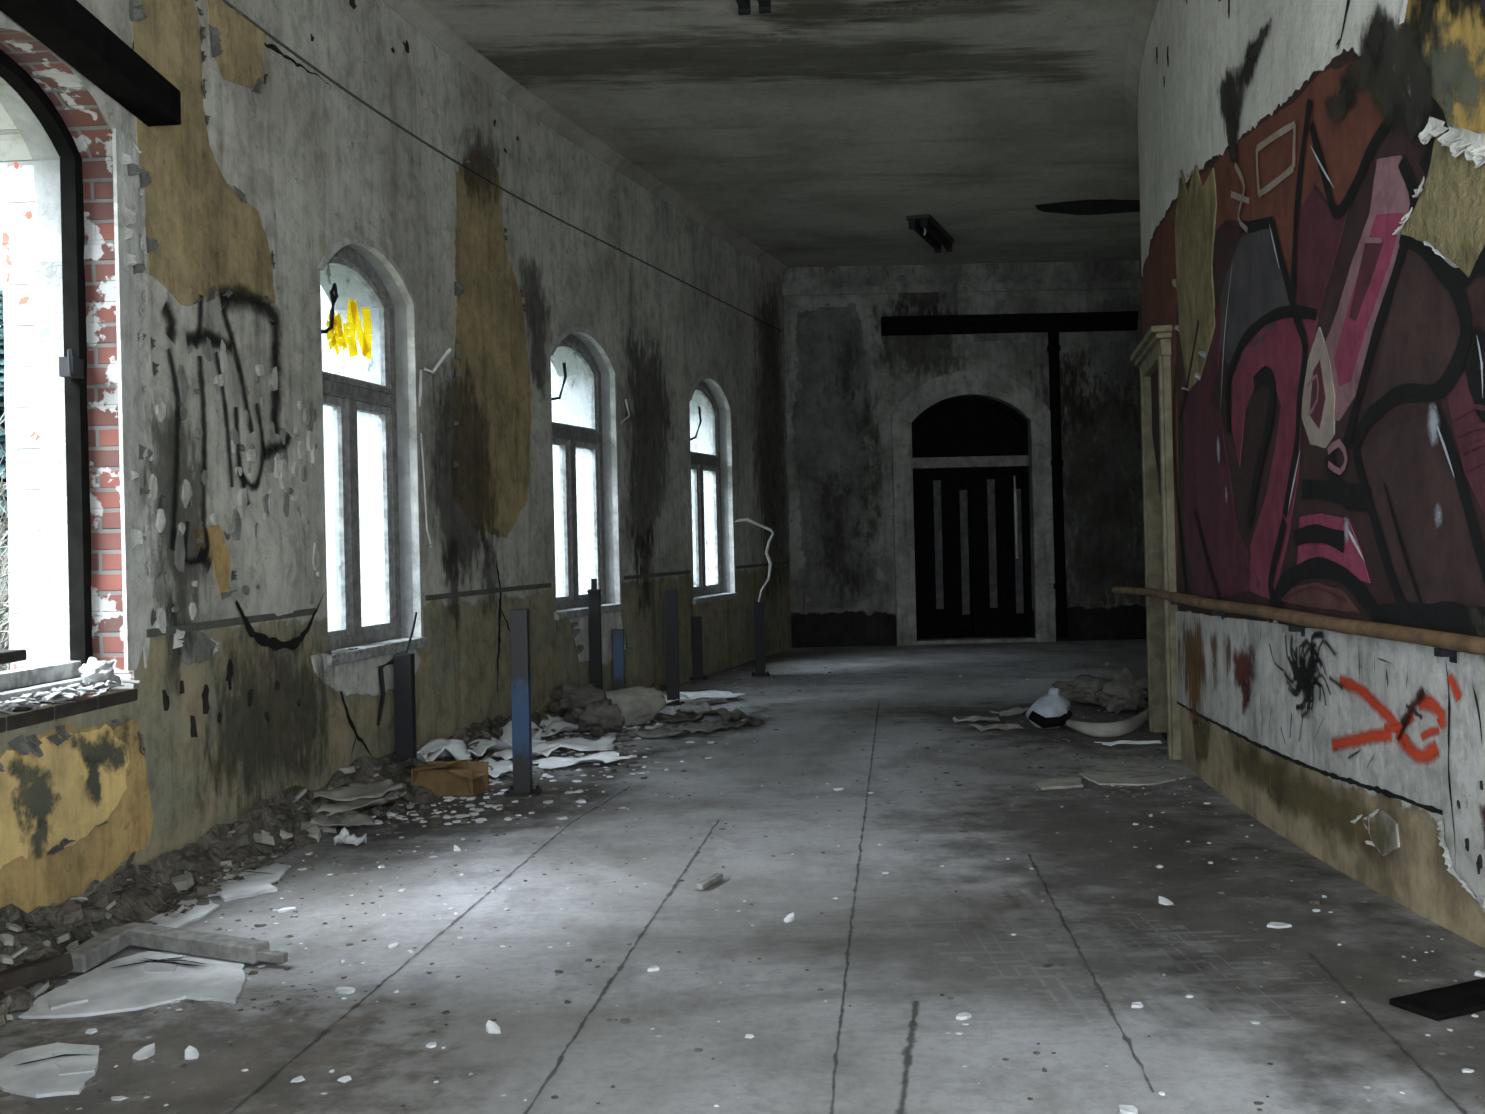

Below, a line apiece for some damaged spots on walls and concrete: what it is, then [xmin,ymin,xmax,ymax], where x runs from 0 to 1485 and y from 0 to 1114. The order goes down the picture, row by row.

leakage [477,0,1080,83]
leakage [1325,0,1485,143]
flaking render [1392,0,1485,278]
peeling [0,0,321,737]
peeling [1172,165,1217,391]
peeling [0,719,154,923]
peeling [1176,611,1485,913]